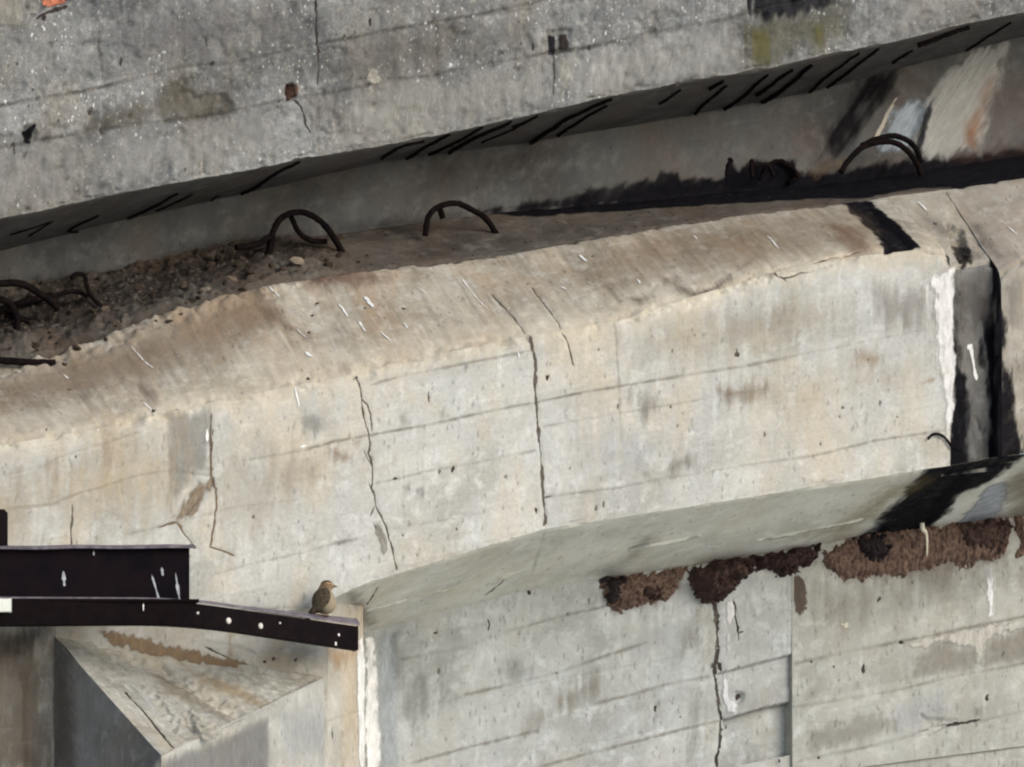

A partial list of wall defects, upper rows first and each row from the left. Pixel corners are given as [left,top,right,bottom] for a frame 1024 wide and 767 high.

corrosion [284,83,298,101]
water stain [484,34,1024,255]
spalling [0,357,56,366]
spalling [0,272,103,331]
crack [158,413,235,556]
spalling [235,209,345,256]
crack [356,378,398,570]
crack [491,294,550,527]
crack [532,288,574,366]
water stain [865,267,1024,535]
crack [711,600,744,767]